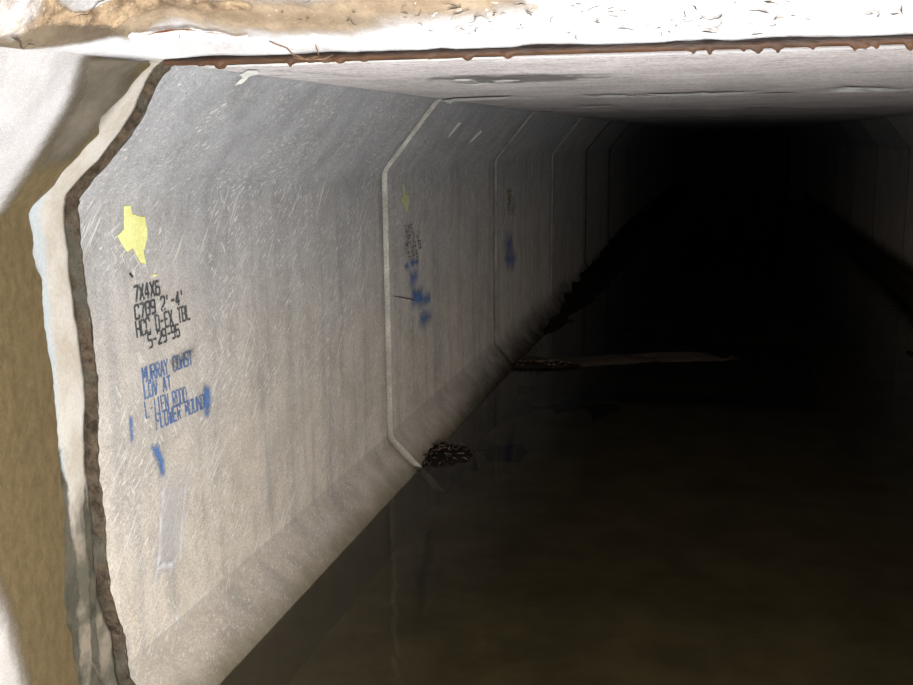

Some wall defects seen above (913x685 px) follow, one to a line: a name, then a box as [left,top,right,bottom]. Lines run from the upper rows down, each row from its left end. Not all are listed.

spalling [0,0,252,43]
peeling [261,0,435,43]
leakage [0,0,913,49]
peeling [432,2,535,34]
peeling [542,0,723,40]
peeling [750,1,810,35]
leakage [226,57,504,67]
rust [163,34,913,69]
leakage [432,75,608,85]